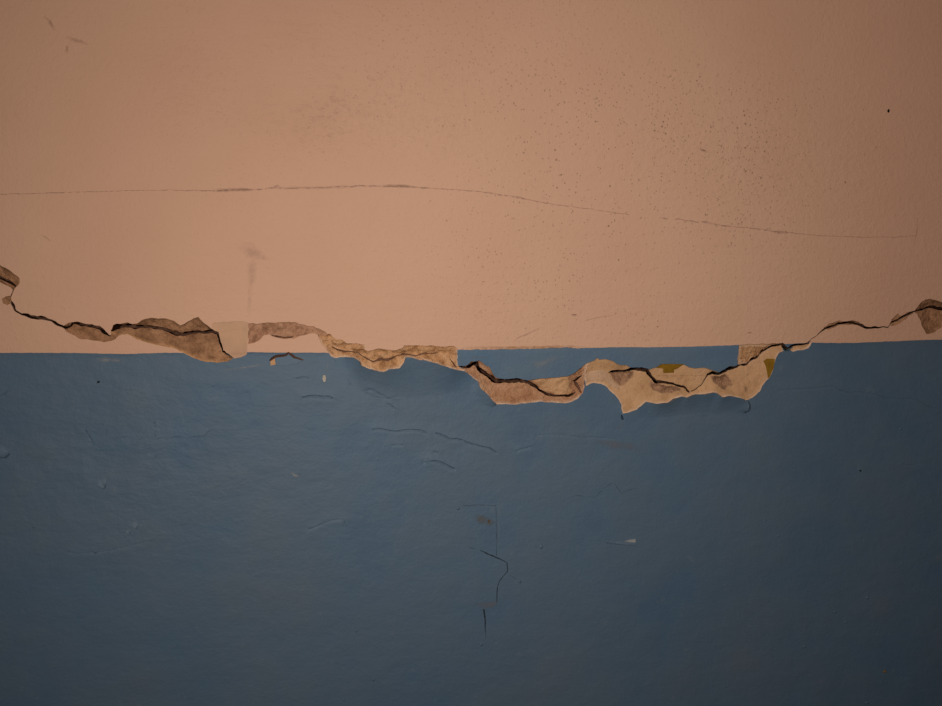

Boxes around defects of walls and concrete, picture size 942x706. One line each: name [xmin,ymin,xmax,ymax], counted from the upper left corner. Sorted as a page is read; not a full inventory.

crack [0,185,628,215]
crack [660,218,918,245]
spalling [0,265,20,305]
crack [0,276,230,356]
spalling [889,299,942,334]
spalling [65,317,812,419]
crack [332,346,582,397]
crack [608,305,942,393]
crack [373,428,531,469]
crack [465,505,518,634]